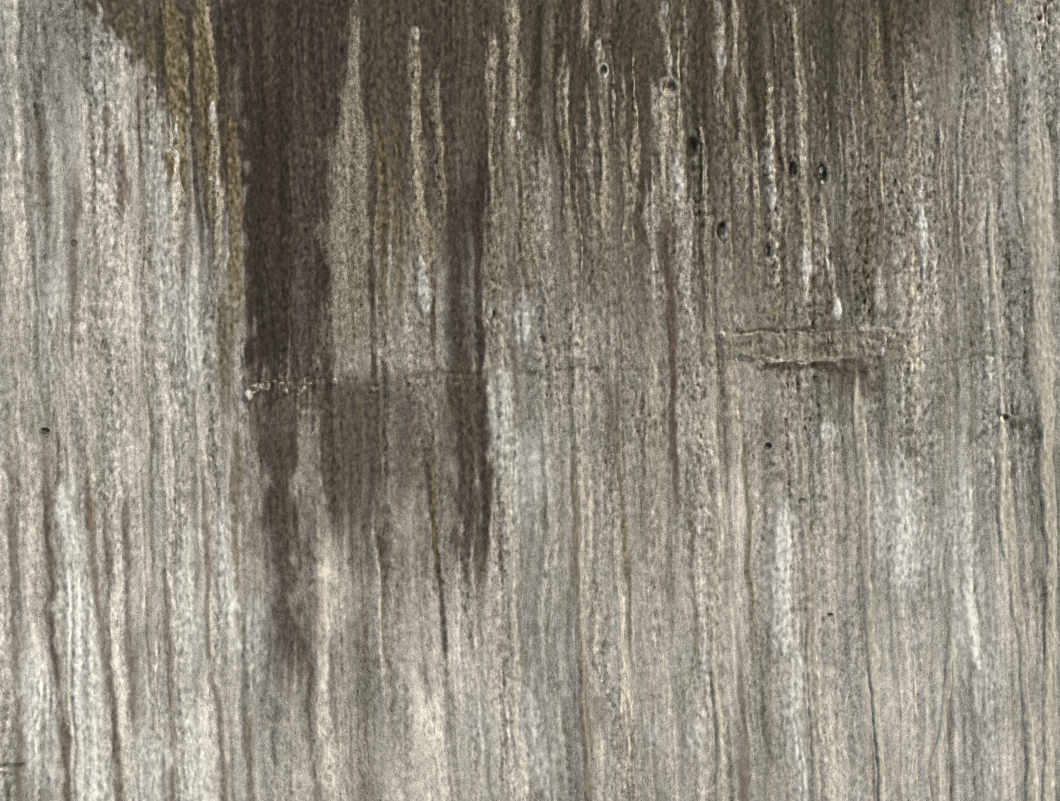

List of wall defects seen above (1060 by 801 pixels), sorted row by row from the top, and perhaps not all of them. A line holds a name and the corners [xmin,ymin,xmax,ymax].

damp [161,114,184,268]
damp [184,283,199,379]
efflorescence [208,101,223,243]
damp [219,0,841,668]
damp [845,103,863,252]
efflorescence [875,270,885,313]
efflorescence [913,176,928,282]
damp [940,92,974,271]
damp [181,479,237,673]
damp [167,721,206,801]
damp [216,695,228,801]